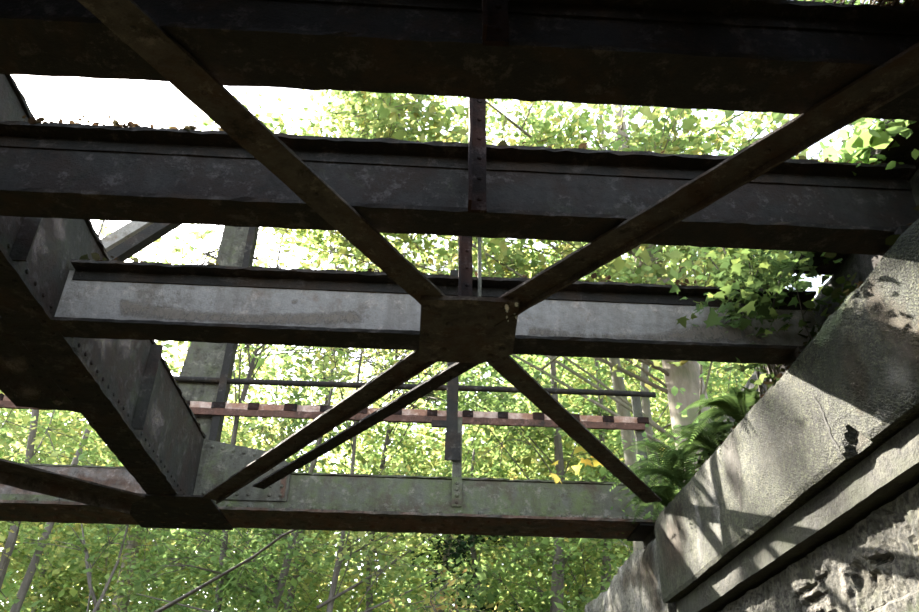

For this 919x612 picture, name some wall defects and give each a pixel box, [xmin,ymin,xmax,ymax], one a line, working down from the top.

spalling [855,431,869,450]
spalling [793,565,848,612]
spalling [856,549,904,601]